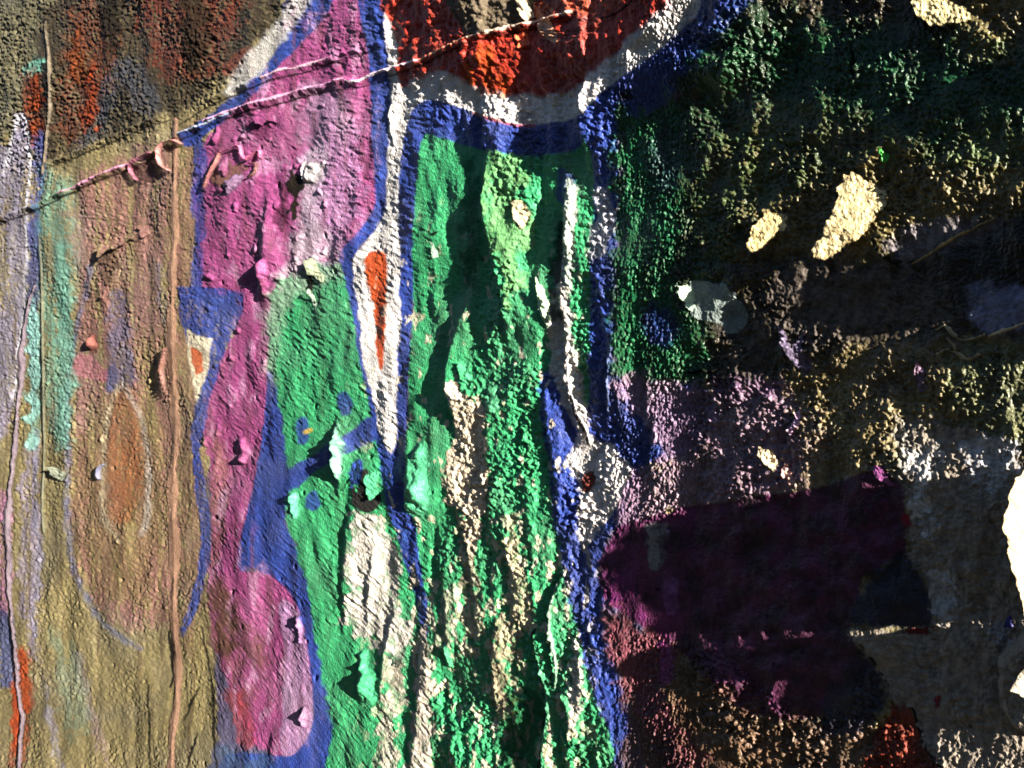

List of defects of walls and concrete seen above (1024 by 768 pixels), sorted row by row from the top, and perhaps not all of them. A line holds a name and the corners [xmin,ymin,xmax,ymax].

peeling [202,110,281,195]
crack [0,0,632,223]
peeling [678,172,1024,380]
peeling [914,360,927,392]
spalling [850,422,1024,768]